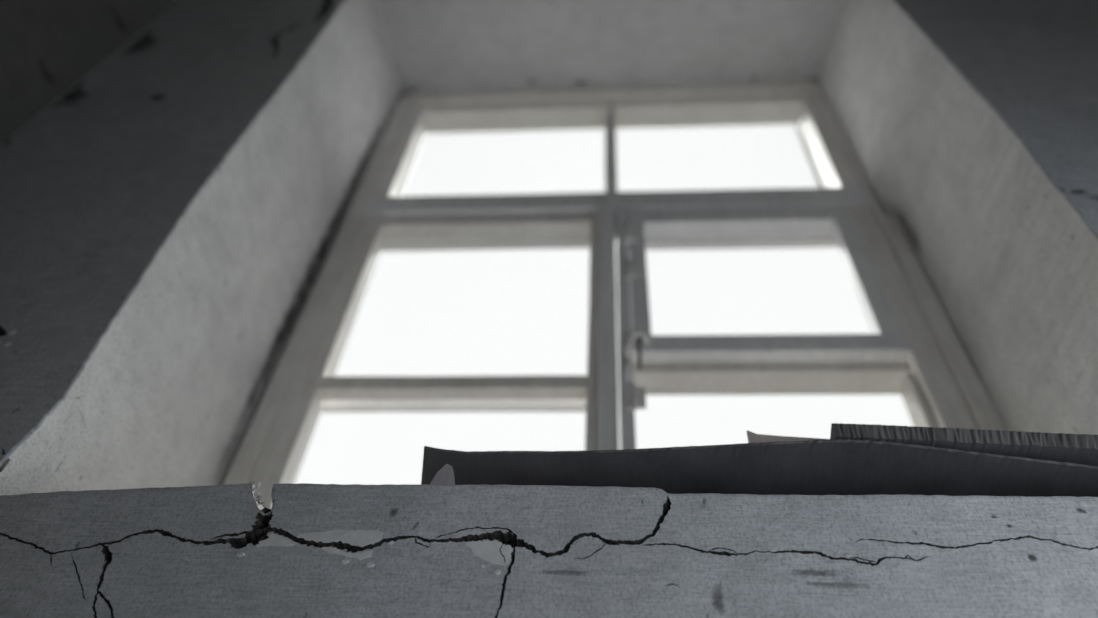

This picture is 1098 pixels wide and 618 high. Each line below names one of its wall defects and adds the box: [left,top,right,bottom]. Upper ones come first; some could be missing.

crack [0,449,10,472]
crack [0,496,1098,618]